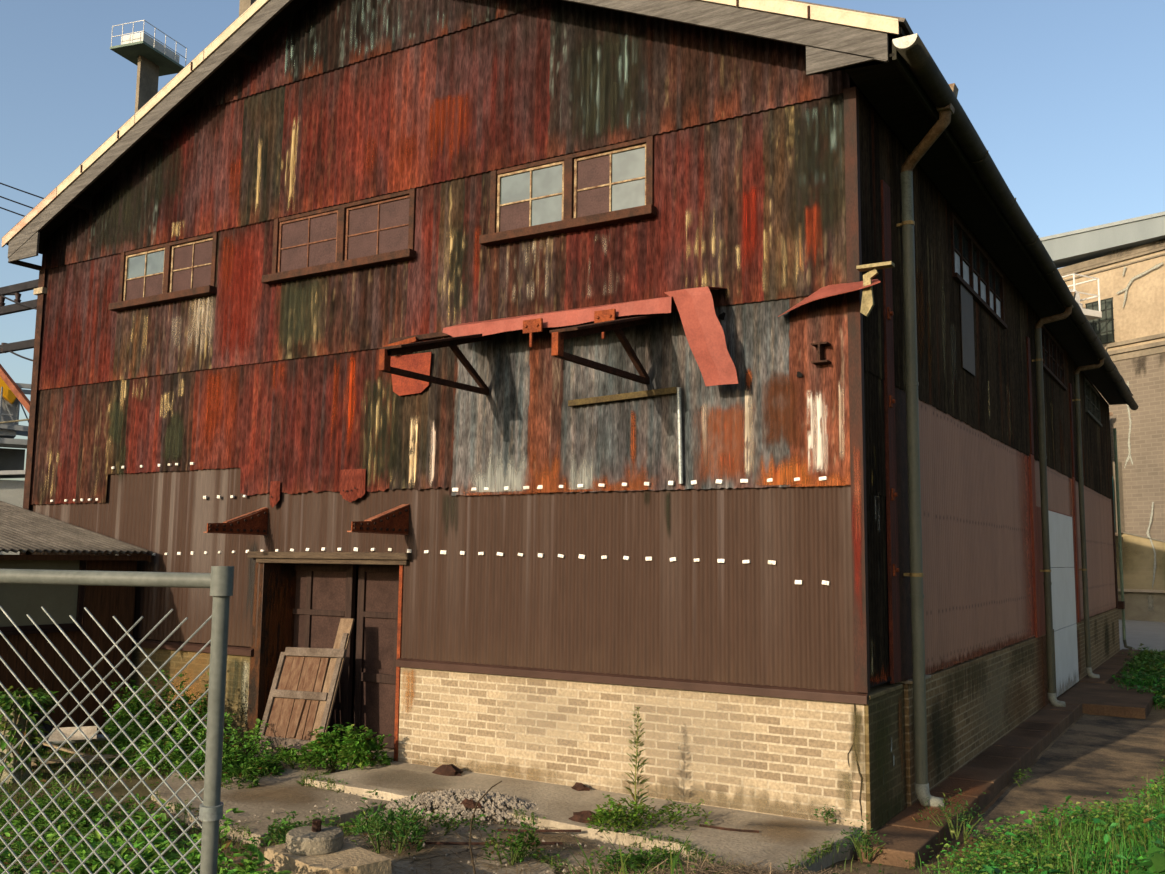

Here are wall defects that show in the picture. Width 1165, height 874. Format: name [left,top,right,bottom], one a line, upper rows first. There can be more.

rust [331,358,355,436]
rust [469,413,647,496]
rust [702,408,745,477]
rust [765,375,797,445]
rust [762,452,861,591]
rust [931,635,1050,710]